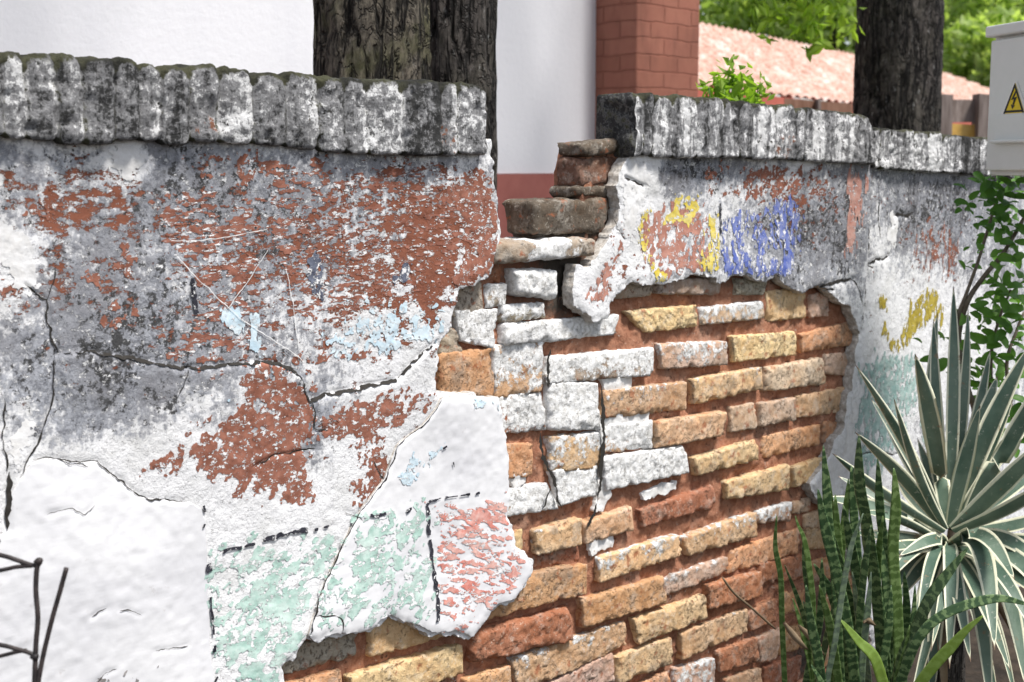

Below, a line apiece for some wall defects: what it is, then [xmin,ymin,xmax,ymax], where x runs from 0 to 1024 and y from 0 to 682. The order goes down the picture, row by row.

flaking render [105,144,146,181]
flaking render [0,223,42,307]
peeling [80,242,140,330]
crack [2,272,433,530]
crack [544,349,552,389]
flaking render [139,138,959,682]
crack [539,433,562,510]
crack [586,387,606,530]